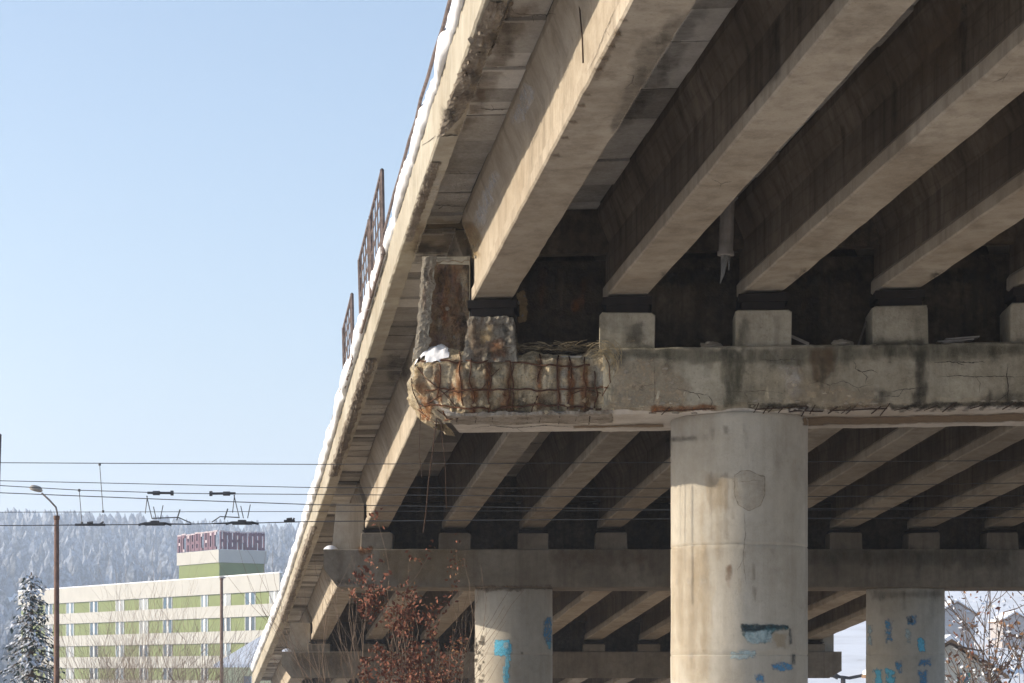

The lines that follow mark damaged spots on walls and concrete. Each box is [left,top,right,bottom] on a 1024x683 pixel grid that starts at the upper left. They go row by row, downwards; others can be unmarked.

spalling [438,1,514,137]
spalling [407,235,715,436]
spalling [748,399,1024,426]
crack [763,356,1012,403]